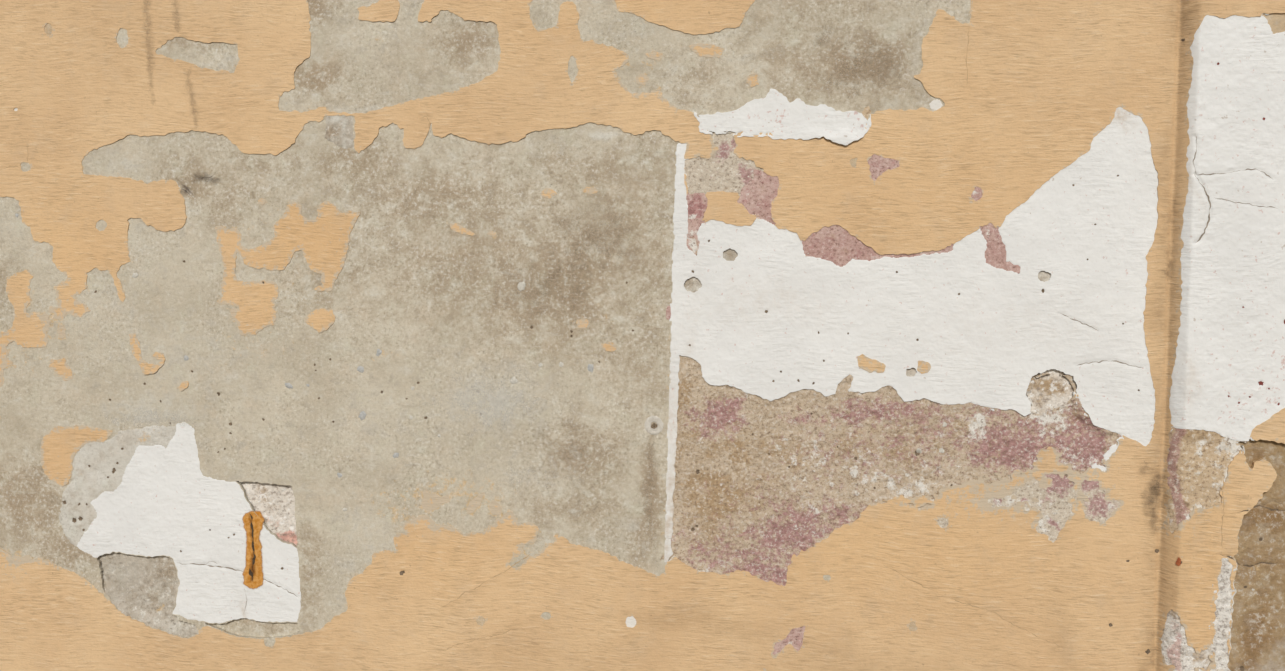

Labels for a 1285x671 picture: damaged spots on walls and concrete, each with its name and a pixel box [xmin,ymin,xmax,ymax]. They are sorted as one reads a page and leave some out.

rust [243,511,264,589]
peeling [0,115,680,647]
peeling [278,0,501,114]
peeling [529,0,1158,586]
peeling [1145,13,1285,671]